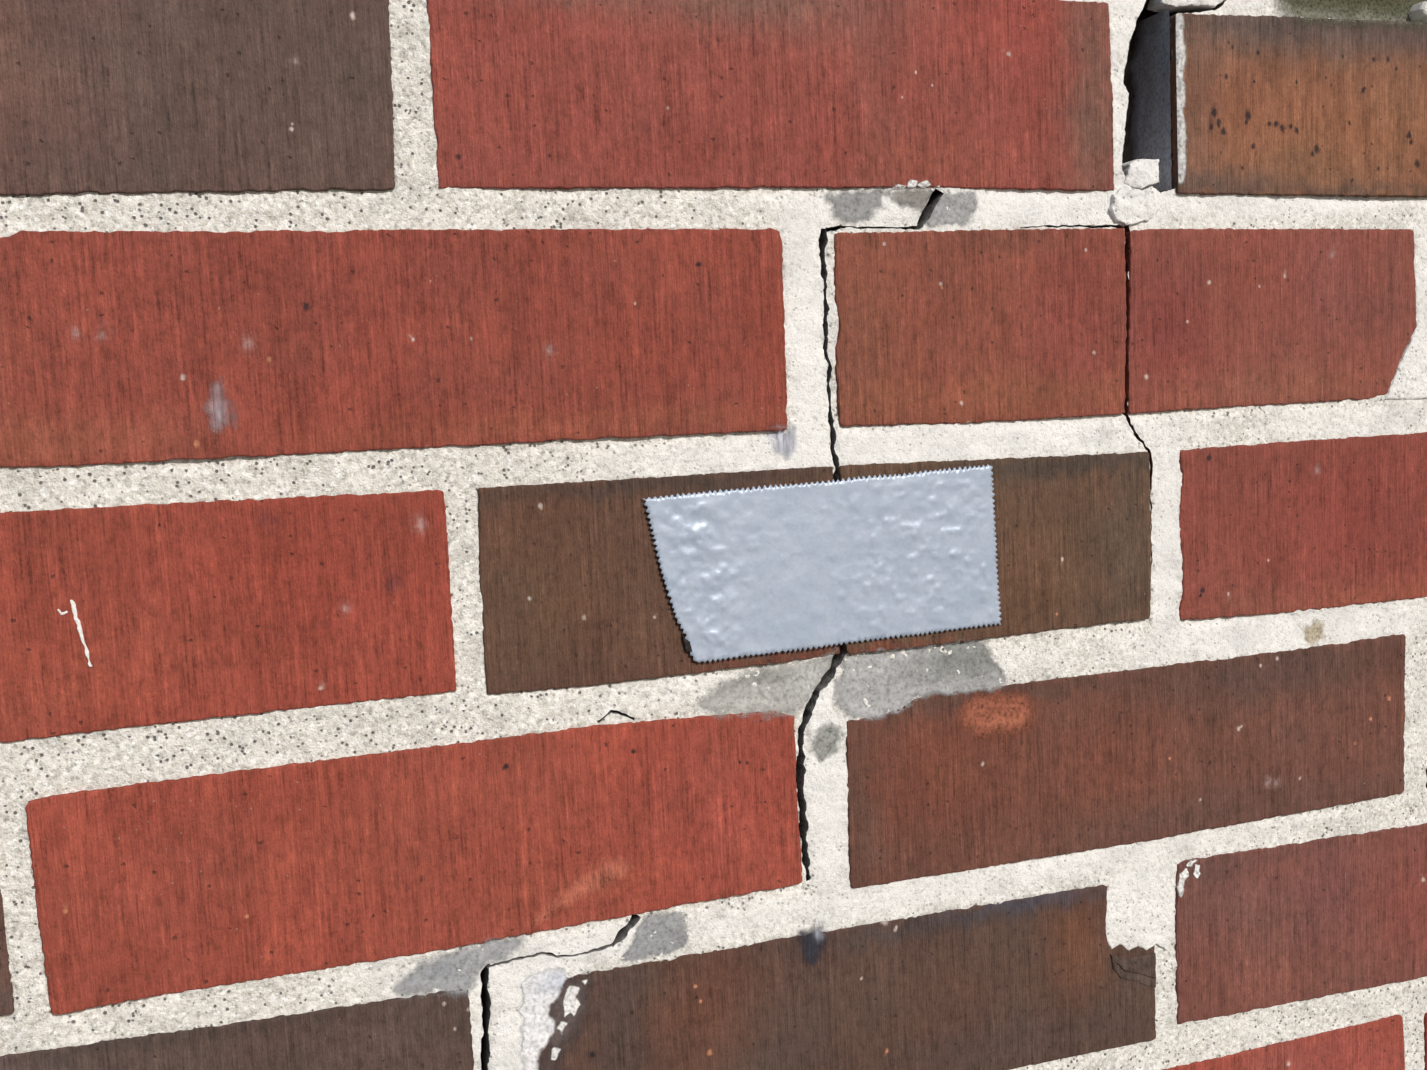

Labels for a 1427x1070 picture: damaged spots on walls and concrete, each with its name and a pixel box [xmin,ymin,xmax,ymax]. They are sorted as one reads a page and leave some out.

crack [818,193,944,480]
crack [1020,224,1130,364]
crack [1122,398,1153,565]
crack [597,710,634,723]
crack [796,648,846,879]
crack [480,915,641,1070]
peeling [557,980,587,1031]